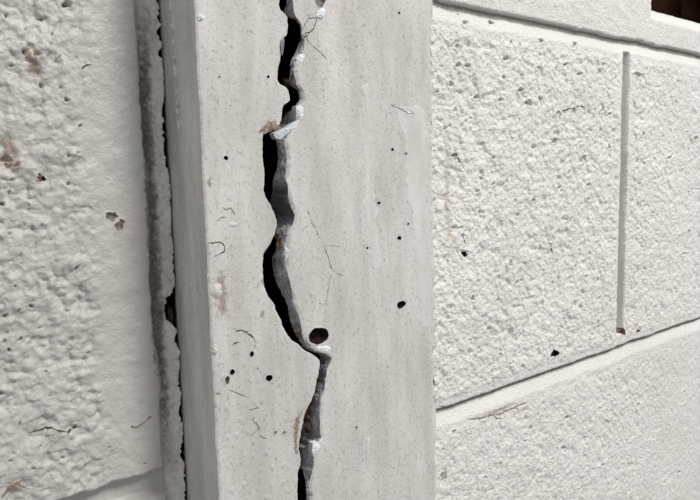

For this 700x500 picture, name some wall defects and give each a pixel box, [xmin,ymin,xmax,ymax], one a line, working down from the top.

crack [155,0,163,58]
crack [161,102,169,169]
spalling [103,210,127,234]
damp [138,48,168,413]
crack [262,0,341,500]
crack [164,270,178,347]
crack [178,370,186,499]